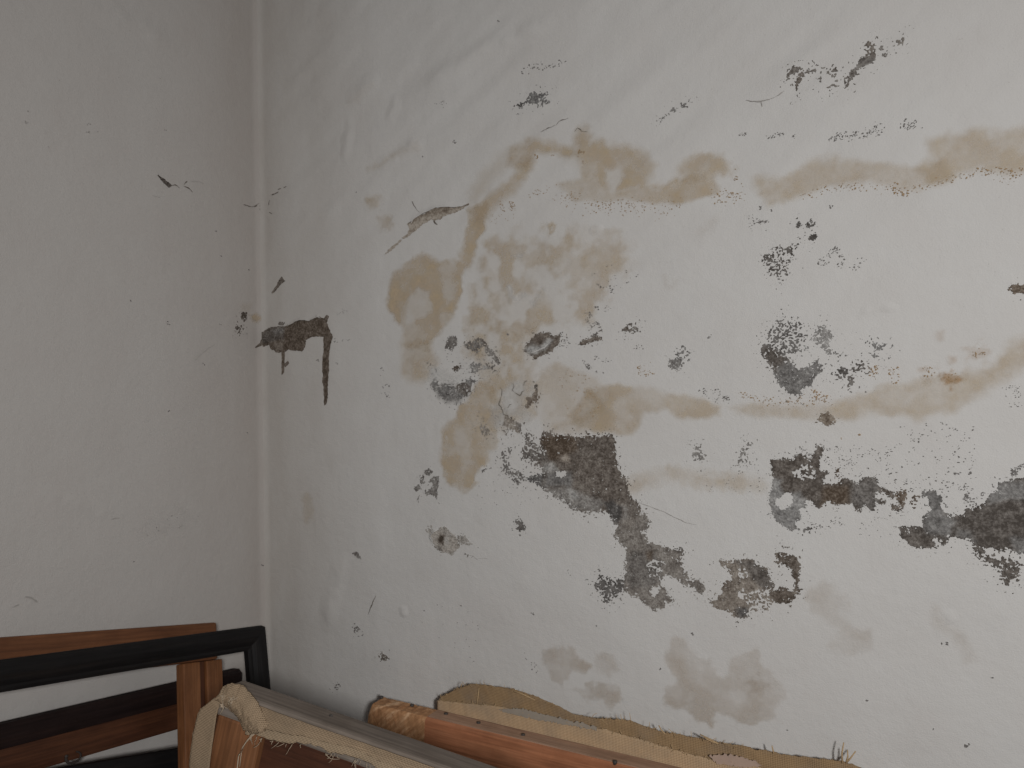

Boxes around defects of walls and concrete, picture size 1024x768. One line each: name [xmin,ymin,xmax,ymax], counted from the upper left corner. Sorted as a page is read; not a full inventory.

flaking render [508,86,559,114]
flaking render [780,25,914,105]
leakage [388,203,489,339]
flaking render [255,311,350,405]
flaking render [426,326,505,410]
flaking render [523,327,567,360]
flaking render [756,305,893,405]
spalling [425,525,474,558]
leakage [442,350,528,487]
flaking render [479,381,806,627]
leakage [793,422,984,507]
flaking render [760,443,1024,594]